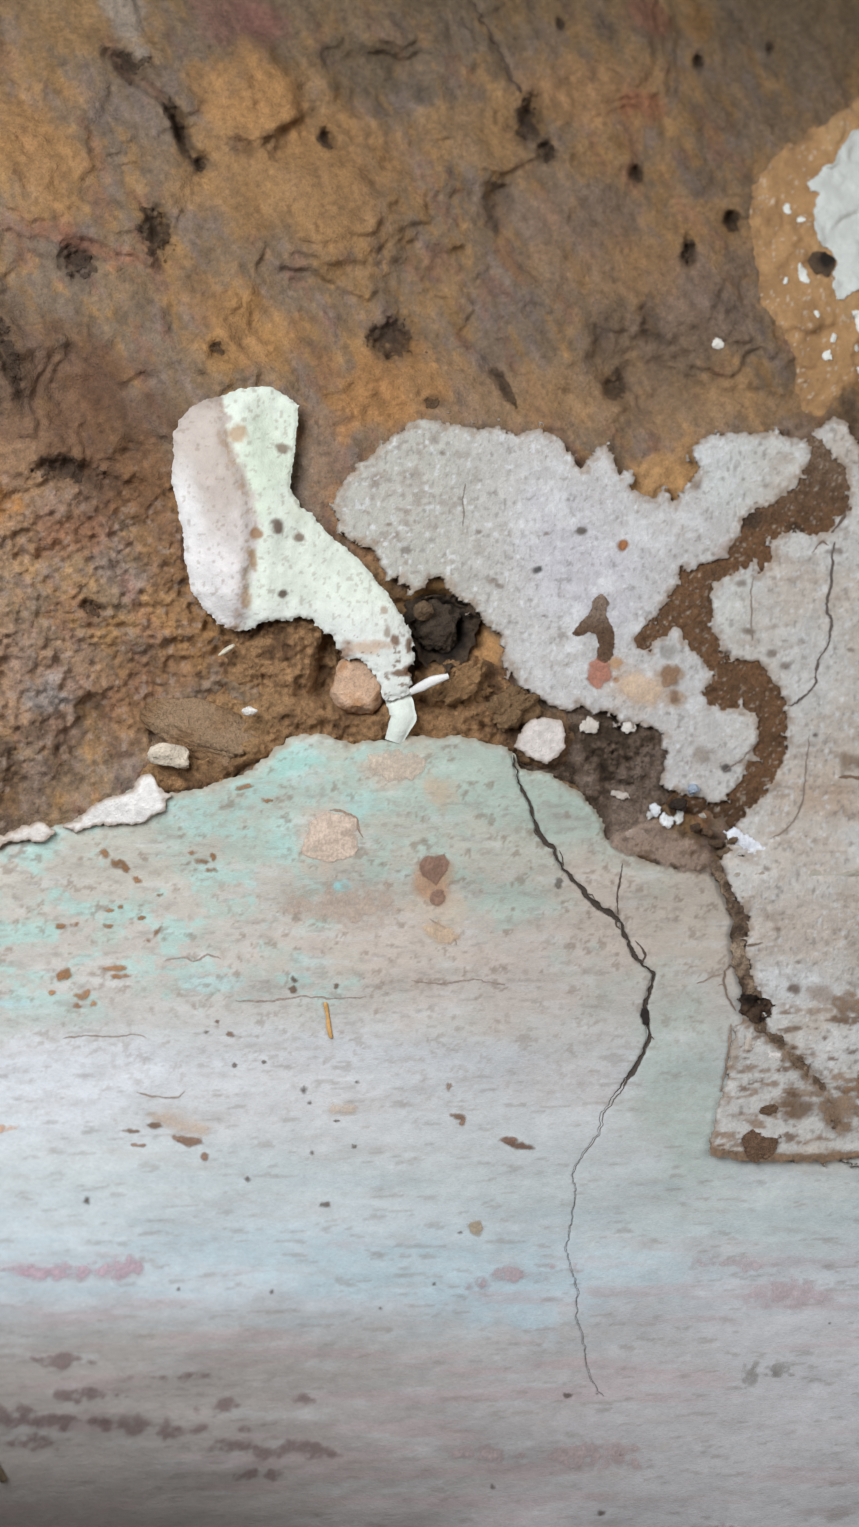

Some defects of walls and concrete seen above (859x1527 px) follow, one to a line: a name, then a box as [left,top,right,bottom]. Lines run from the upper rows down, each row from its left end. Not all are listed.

flaking render [0,0,859,875]
crack [513,755,655,1396]